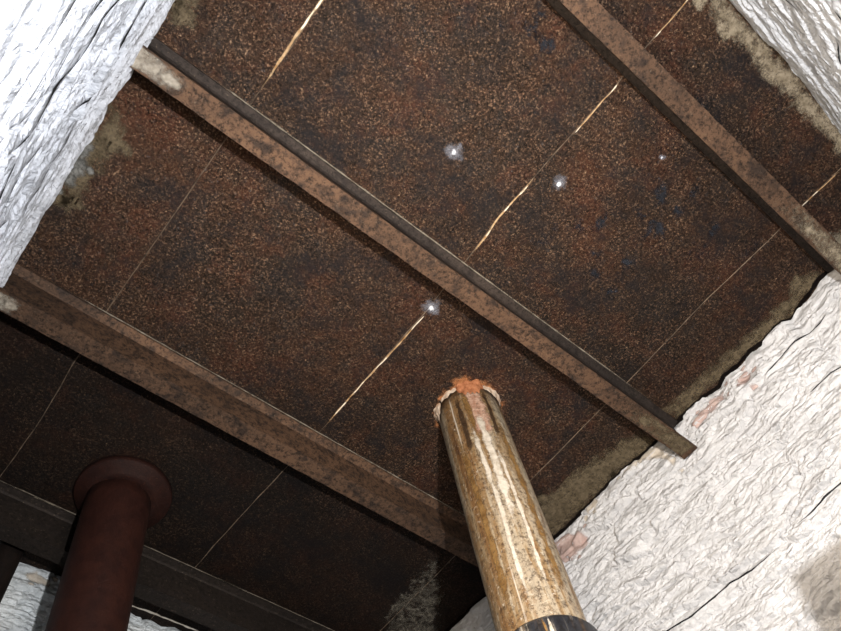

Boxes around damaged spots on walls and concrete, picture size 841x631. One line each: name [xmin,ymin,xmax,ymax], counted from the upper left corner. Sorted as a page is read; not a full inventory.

corrosion [266,0,323,81]
leakage [693,0,841,153]
corrosion [476,182,531,249]
leakage [800,218,841,272]
corrosion [330,317,423,420]
corrosion [433,376,503,426]
leakage [662,272,820,417]
leakage [456,393,693,612]